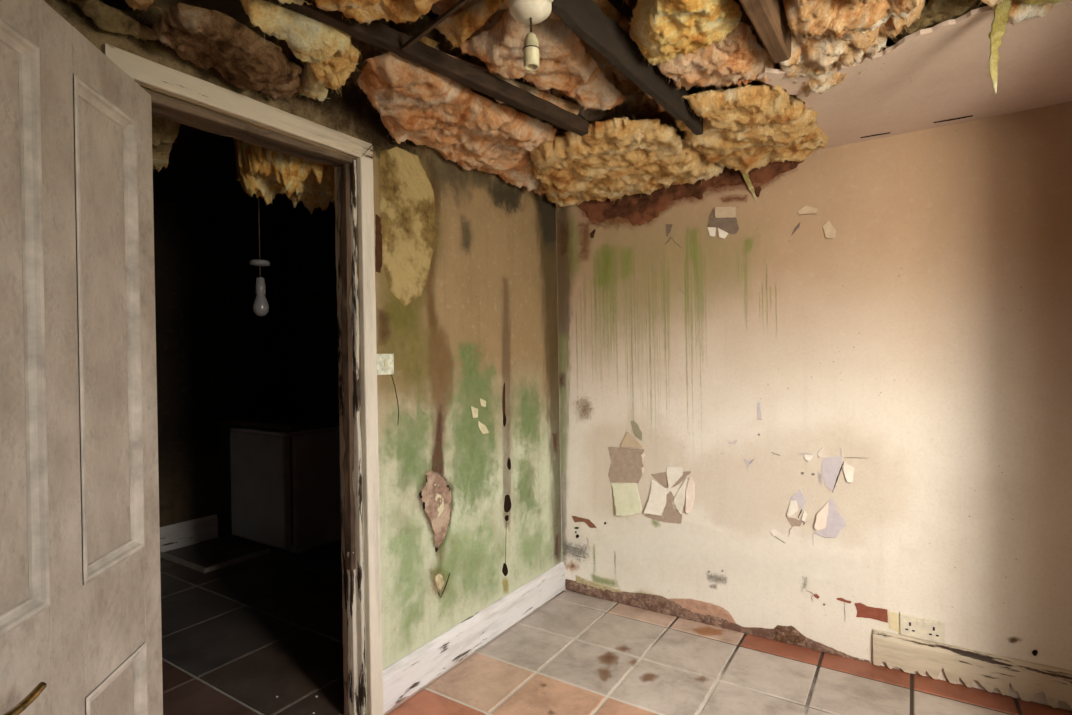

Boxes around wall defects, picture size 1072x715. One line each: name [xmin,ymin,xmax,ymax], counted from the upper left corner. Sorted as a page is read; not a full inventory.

peeling [373,142,447,348]
peeling [575,159,805,239]
peeling [791,205,836,239]
damp [376,146,926,653]
flaking render [416,470,455,601]
peeling [572,432,695,538]
peeling [787,500,829,531]
peeling [843,463,854,482]
flaking render [565,575,870,663]
flaking render [854,603,900,634]